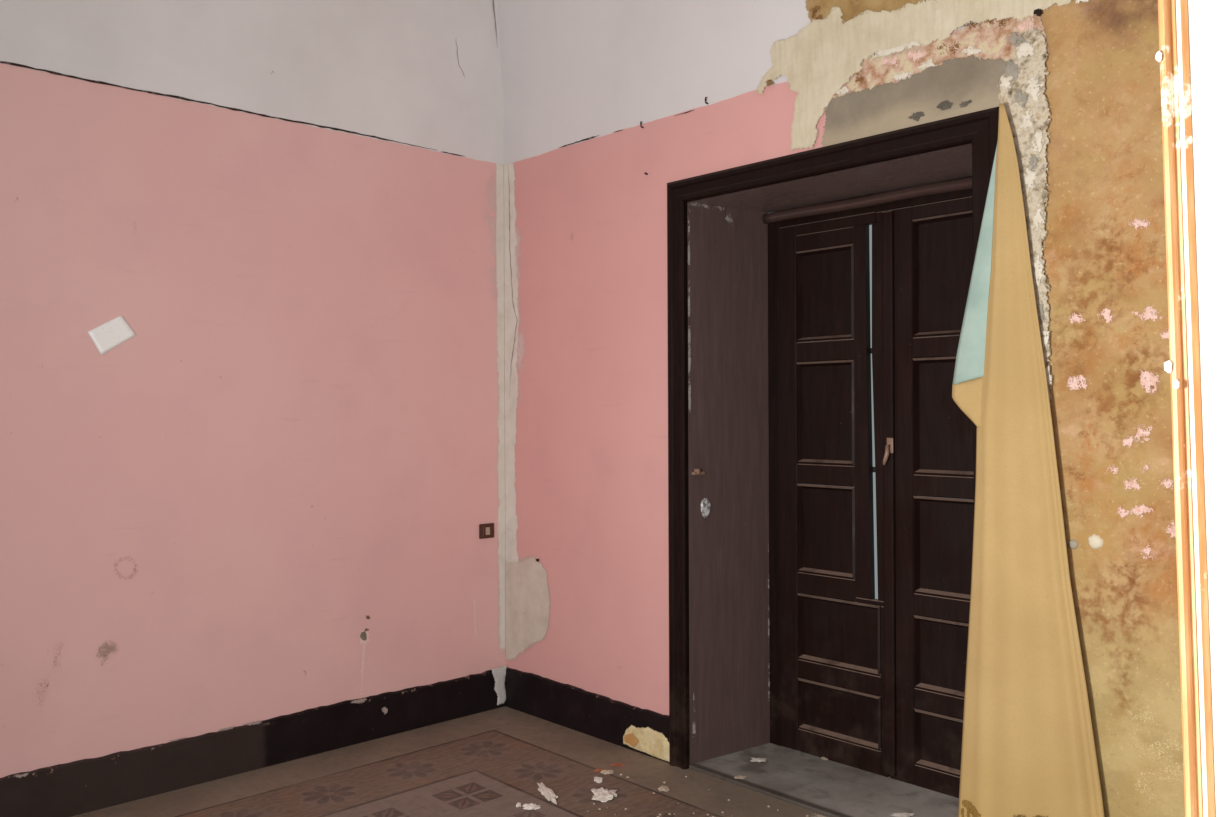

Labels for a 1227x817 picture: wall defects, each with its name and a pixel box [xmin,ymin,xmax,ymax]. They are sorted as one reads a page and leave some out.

flaking render [805,0,946,24]
peeling [830,0,1185,817]
flaking render [623,725,669,762]